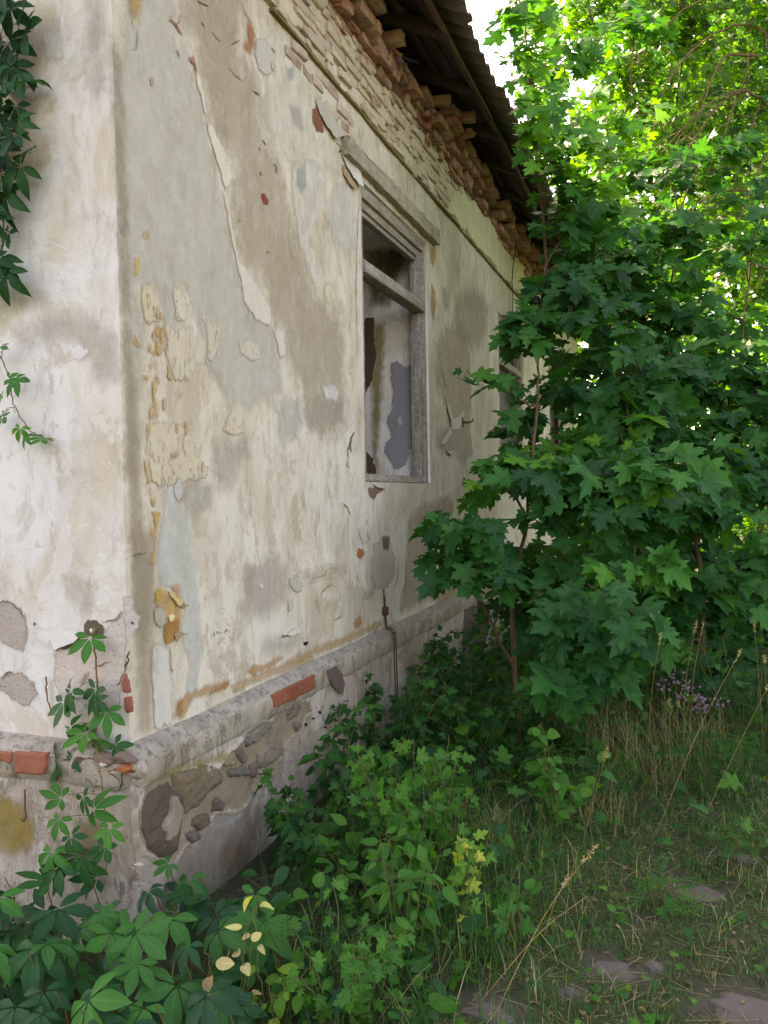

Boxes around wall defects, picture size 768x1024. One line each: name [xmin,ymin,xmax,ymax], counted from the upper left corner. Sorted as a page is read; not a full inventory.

leakage [267,16,354,304]
flaking render [255,0,463,208]
peeling [118,0,286,703]
spalling [437,327,472,461]
spalling [357,496,453,610]
spalling [0,600,35,652]
spalling [0,671,37,705]
leakage [0,797,33,852]
spalling [69,674,338,867]